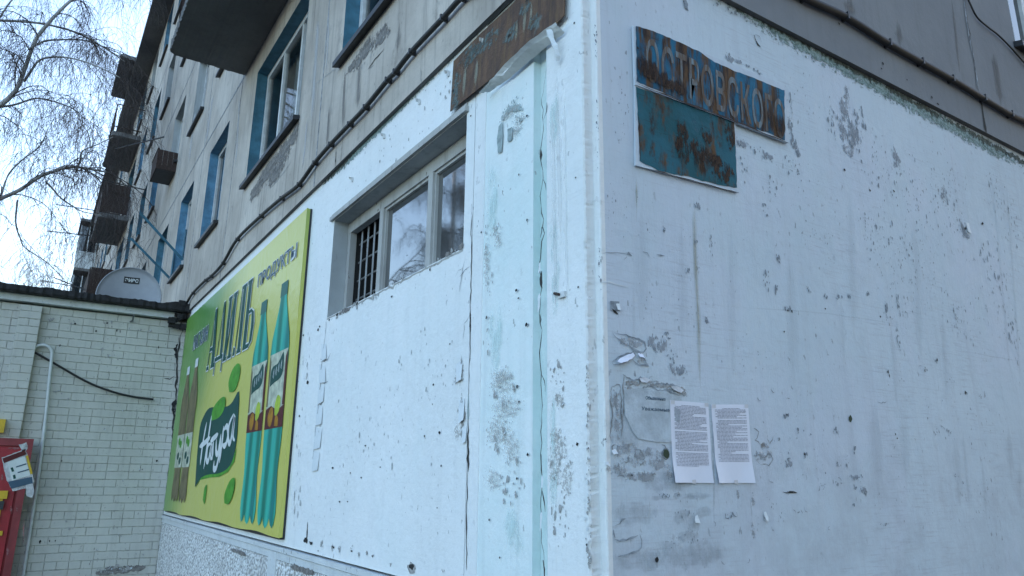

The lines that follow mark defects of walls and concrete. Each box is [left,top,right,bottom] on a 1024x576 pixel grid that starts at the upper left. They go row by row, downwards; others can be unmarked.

peeling [497,96,528,153]
crack [164,330,183,454]
crack [459,205,472,362]
crack [463,394,471,570]
peeling [486,365,529,506]
crack [539,76,547,576]
peeling [550,359,564,410]
peeling [540,429,591,569]
peeling [648,332,687,376]
peeling [827,86,984,348]